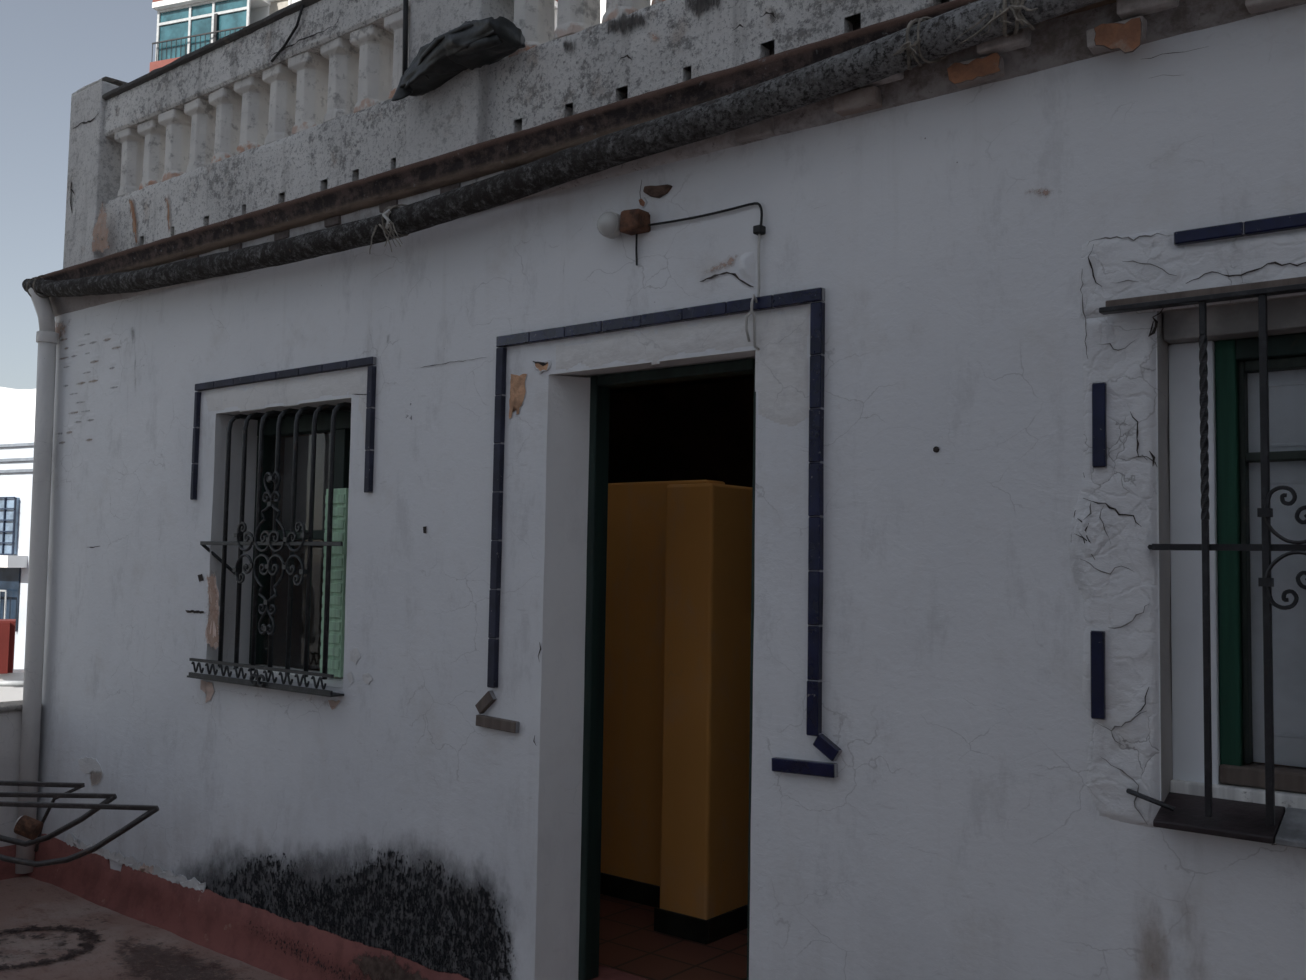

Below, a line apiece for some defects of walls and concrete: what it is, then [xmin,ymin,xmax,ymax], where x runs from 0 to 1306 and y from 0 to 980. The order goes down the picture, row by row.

crack [1080,233,1306,358]
peeling [509,359,551,419]
crack [1130,412,1157,466]
crack [1071,473,1142,575]
spalling [186,574,220,650]
crack [1097,688,1149,825]
damp [189,844,516,980]